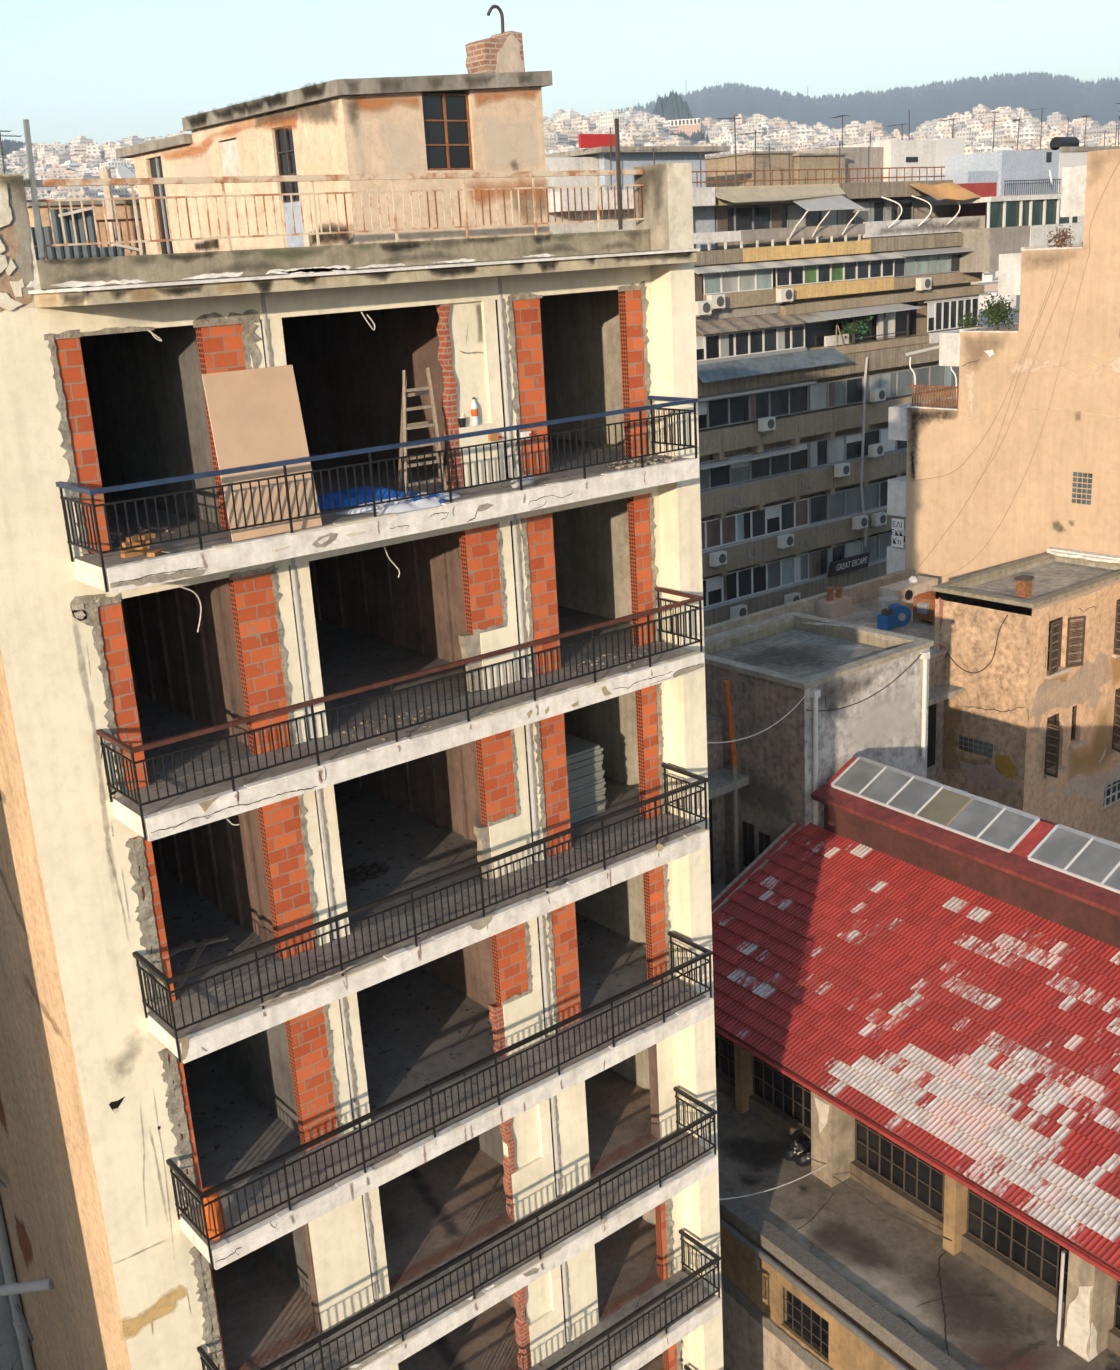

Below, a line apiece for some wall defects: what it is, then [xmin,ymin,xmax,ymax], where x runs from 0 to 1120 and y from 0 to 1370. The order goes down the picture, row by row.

peeling [0,175,147,312]
spalling [181,272,243,280]
spalling [266,263,406,274]
peeling [1064,1286,1098,1361]